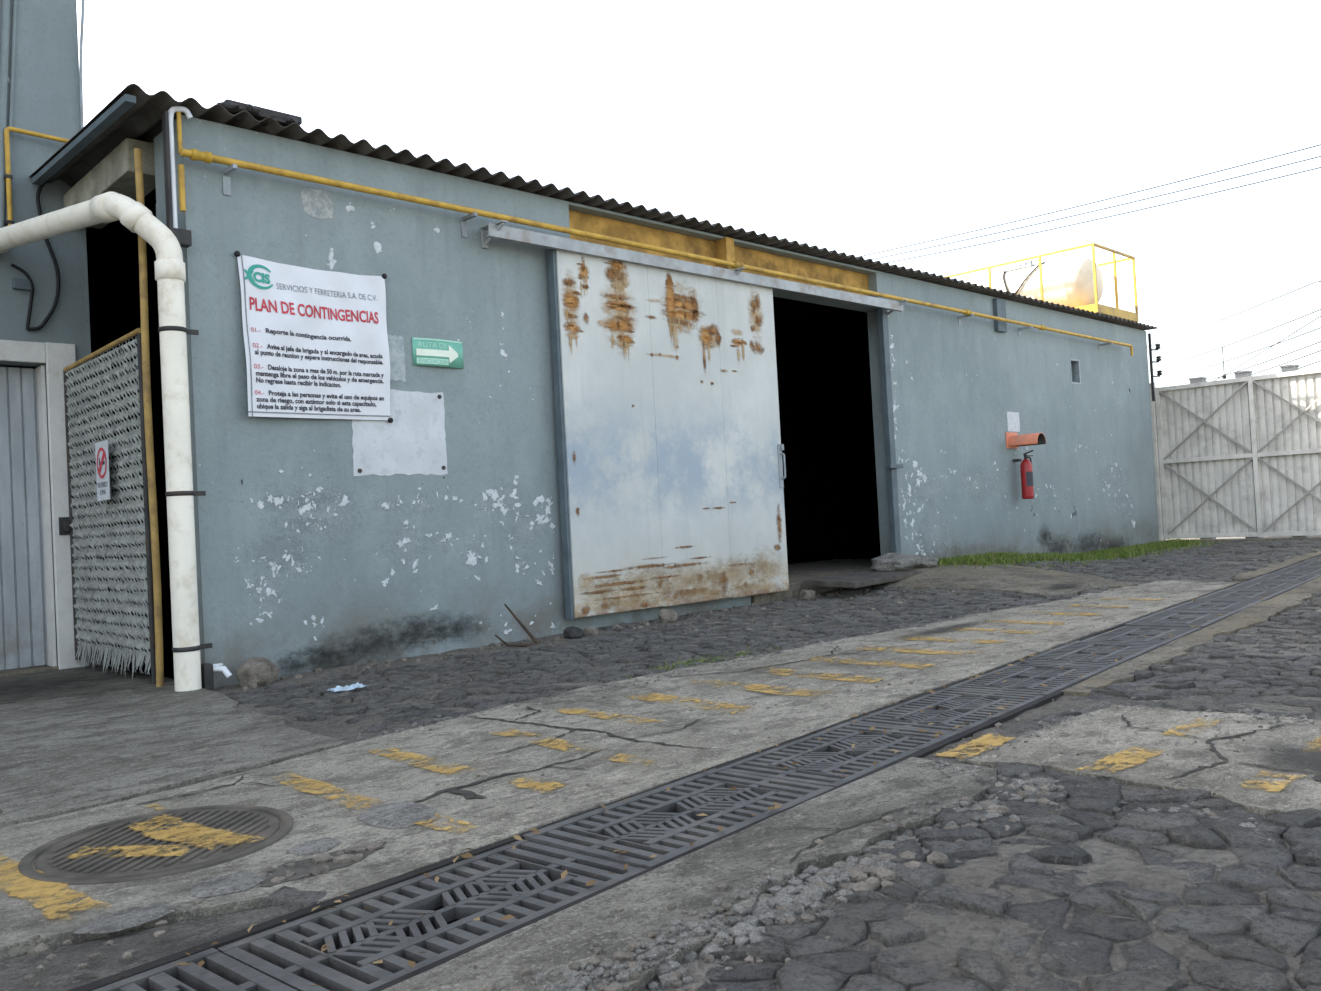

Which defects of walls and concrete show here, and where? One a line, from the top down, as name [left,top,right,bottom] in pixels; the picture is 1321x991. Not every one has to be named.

rust [563,257,634,357]
rust [649,274,764,385]
peeling [893,400,1137,555]
peeling [235,473,349,626]
peeling [376,475,555,587]
rust [583,513,781,614]
damp [290,620,469,670]
crack [414,706,727,803]
crack [1121,714,1321,781]